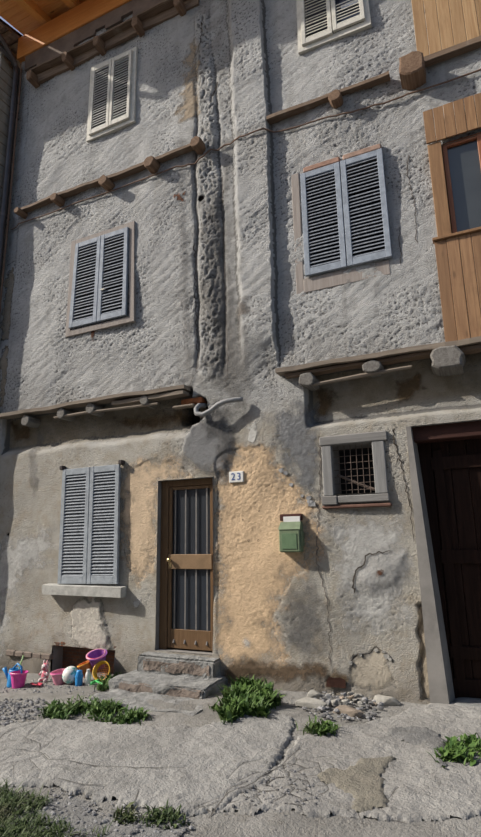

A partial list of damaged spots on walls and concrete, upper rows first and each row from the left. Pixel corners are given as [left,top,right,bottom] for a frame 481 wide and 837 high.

leakage [271,389,333,492]
crack [393,428,414,538]
crack [316,437,332,663]
crack [352,550,390,593]
leakage [286,586,324,653]
leakage [224,660,326,682]
flaking render [326,648,392,690]
crack [230,754,334,809]